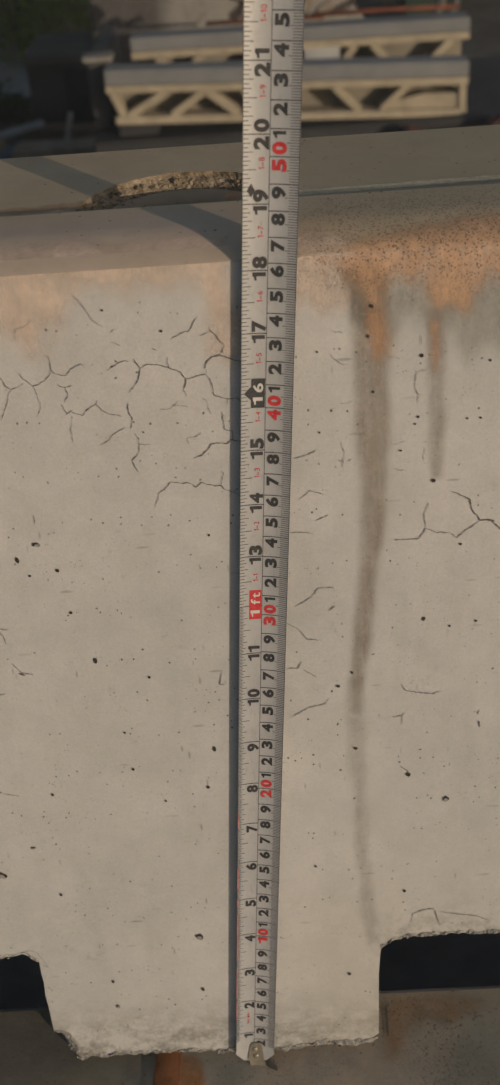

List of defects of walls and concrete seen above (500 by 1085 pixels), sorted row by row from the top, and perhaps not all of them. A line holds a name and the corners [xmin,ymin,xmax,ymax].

spalling [76,170,242,211]
corrosion [347,217,500,307]
crack [0,297,241,507]
crack [395,491,500,541]